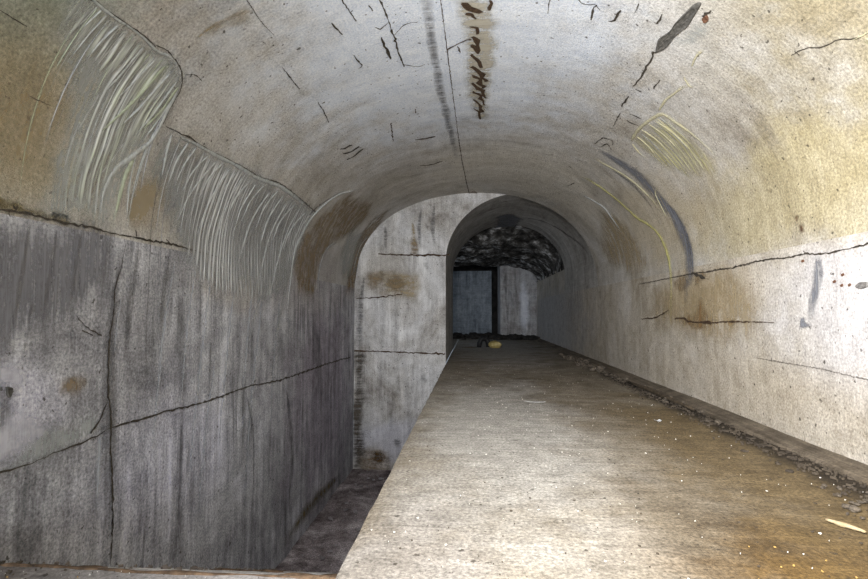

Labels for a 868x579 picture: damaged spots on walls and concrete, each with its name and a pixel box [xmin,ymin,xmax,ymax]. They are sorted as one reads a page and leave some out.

water stain [631,78,708,172]
water stain [0,0,352,493]
water stain [595,153,693,280]
crack [642,242,868,284]
spalling [832,273,868,289]
crack [0,205,449,558]